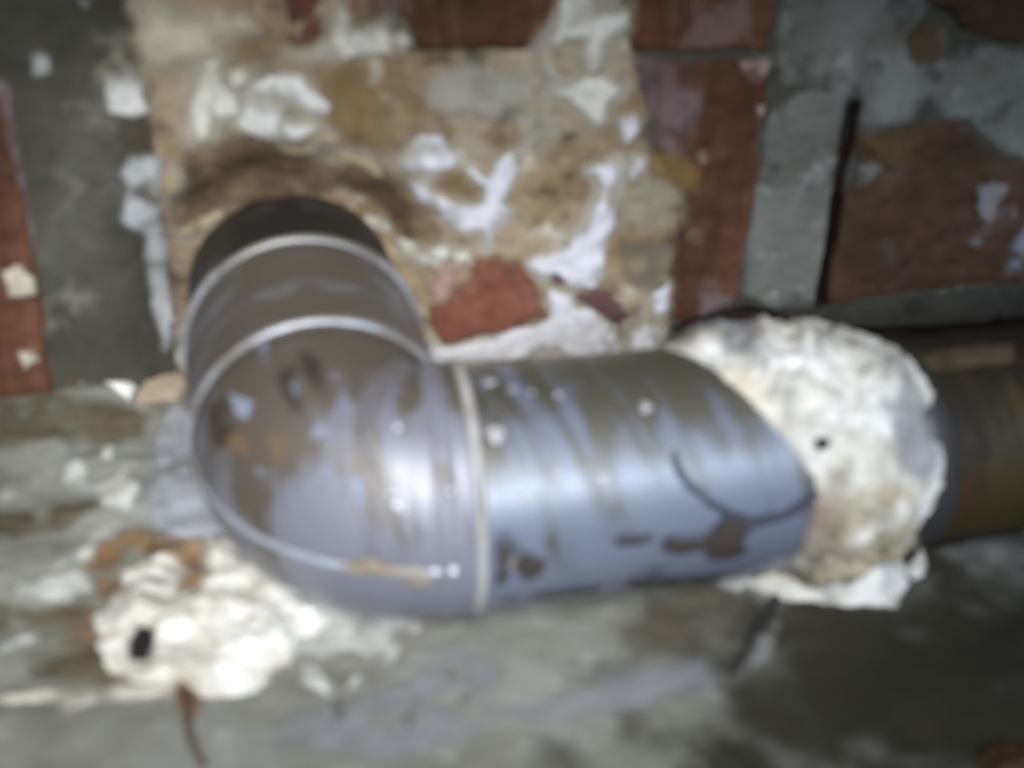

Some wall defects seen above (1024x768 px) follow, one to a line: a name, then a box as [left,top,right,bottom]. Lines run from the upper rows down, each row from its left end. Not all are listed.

peeling [131,0,410,177]
peeling [536,0,634,129]
spalling [2,266,37,297]
peeling [121,157,235,348]
peeling [396,116,679,366]
crack [814,100,863,306]
spalling [858,162,883,182]
peeling [978,184,1007,221]
peeling [1011,234,1024,267]
spalling [19,352,39,368]